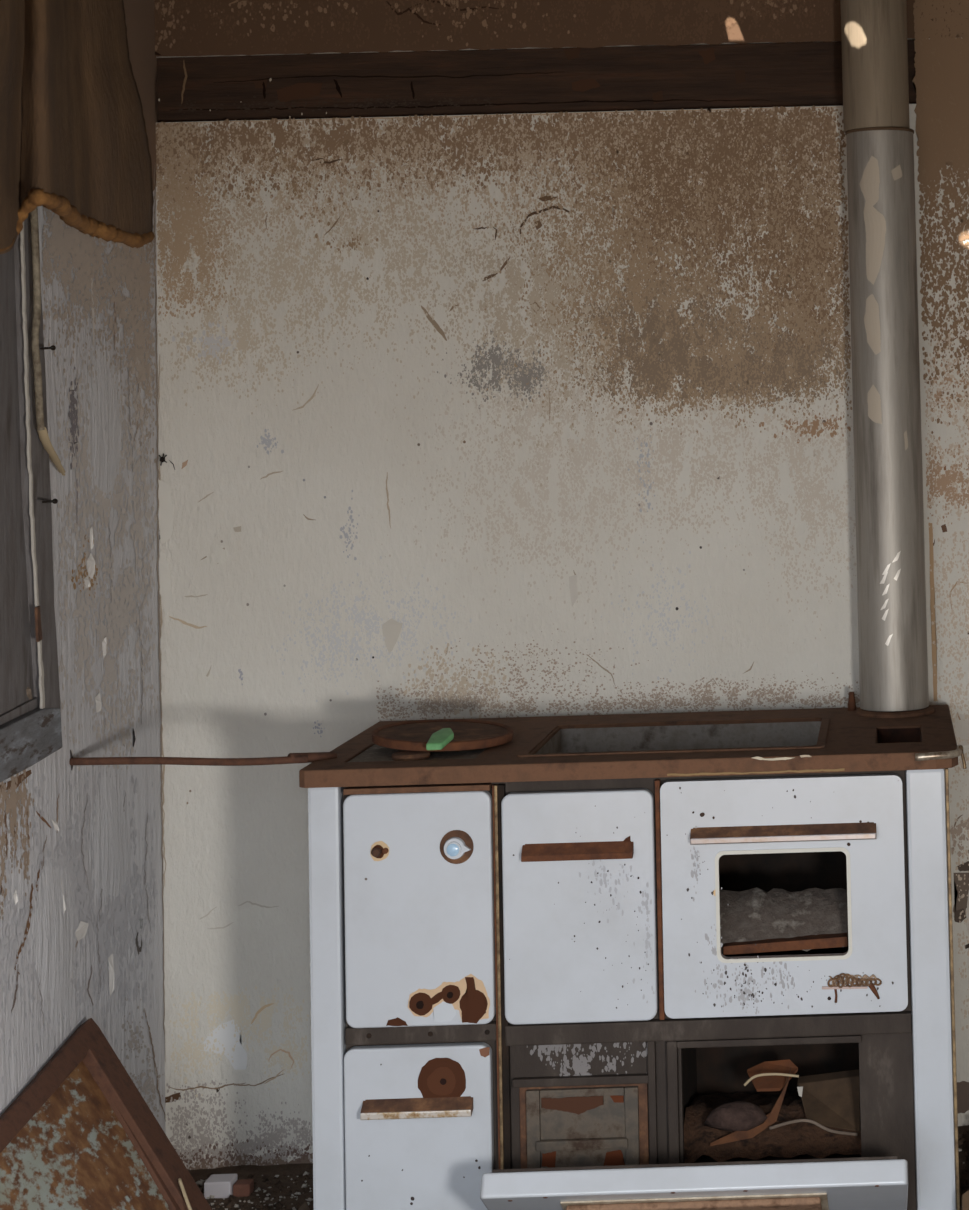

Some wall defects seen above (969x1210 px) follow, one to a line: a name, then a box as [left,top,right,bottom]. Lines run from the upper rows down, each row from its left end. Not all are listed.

damp [0,93,860,1170]
spalling [950,818,969,923]